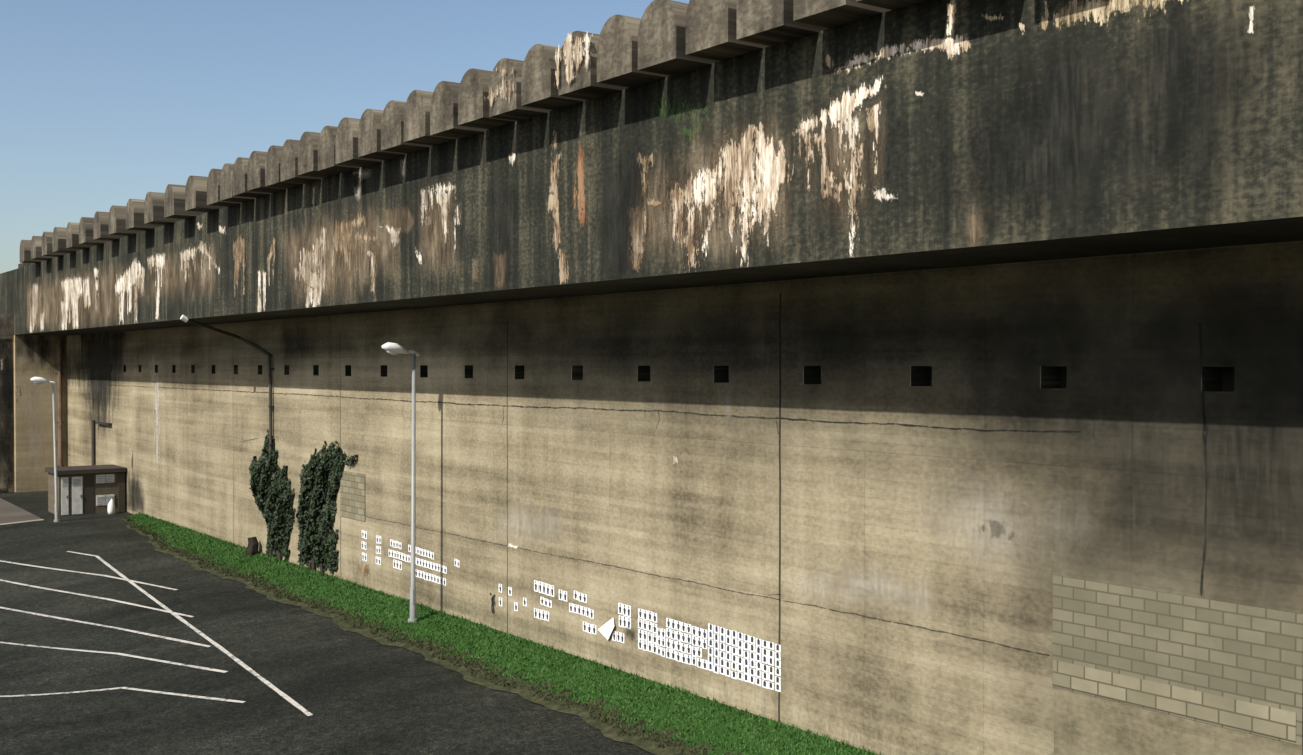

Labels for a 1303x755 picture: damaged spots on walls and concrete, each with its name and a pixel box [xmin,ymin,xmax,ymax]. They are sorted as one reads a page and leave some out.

spalling [1019,0,1210,35]
peeling [628,3,971,273]
water stain [969,32,1246,208]
peeling [30,283,45,333]
peeling [61,268,99,330]
peeling [115,222,246,325]
peeling [267,238,276,285]
peeling [295,212,401,308]
peeling [421,182,462,248]
water stain [608,159,641,263]
water stain [789,291,1303,393]
water stain [0,332,124,488]